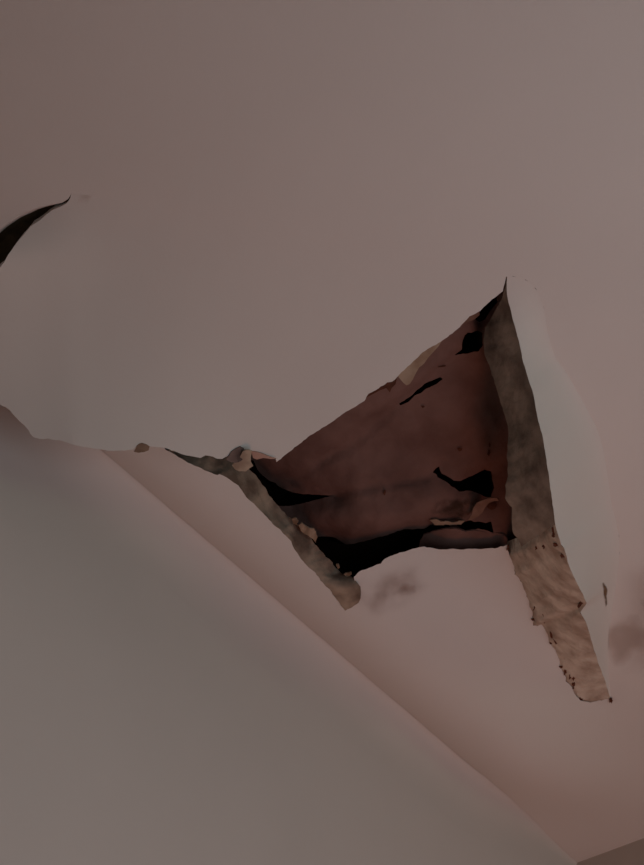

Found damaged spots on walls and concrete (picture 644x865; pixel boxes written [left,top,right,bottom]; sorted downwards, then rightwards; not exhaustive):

crack [0,195,71,264]
spalling [483,280,555,547]
spalling [167,450,361,611]